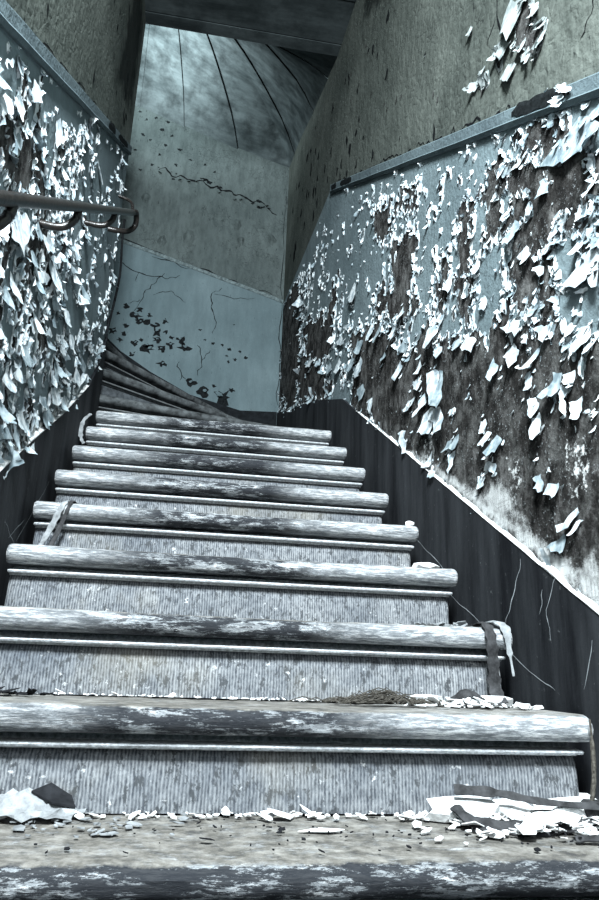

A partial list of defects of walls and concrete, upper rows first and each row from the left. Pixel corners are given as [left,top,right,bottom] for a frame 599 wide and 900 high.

peeling [462,0,548,98]
peeling [0,42,192,479]
crack [118,167,286,404]
peeling [277,83,599,606]
leakage [411,436,599,605]